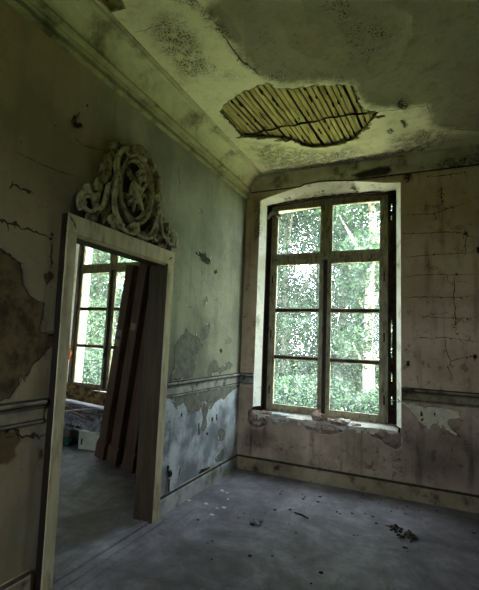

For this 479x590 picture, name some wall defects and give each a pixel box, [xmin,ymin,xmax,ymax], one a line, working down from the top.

damp [155,19,204,75]
damp [204,0,479,129]
crack [9,181,33,194]
damp [259,128,453,171]
damp [353,167,391,178]
crack [0,219,55,267]
peeling [195,249,218,274]
peeling [0,248,55,401]
crack [403,273,478,379]
peeling [171,385,239,435]
spalling [368,430,403,451]
peeling [398,399,463,437]